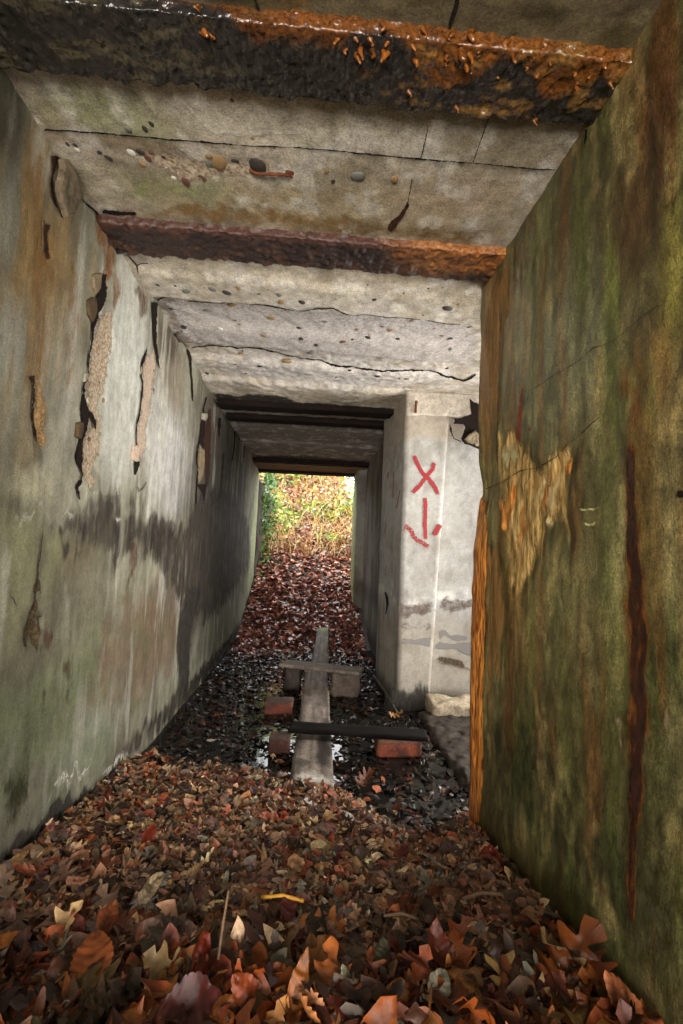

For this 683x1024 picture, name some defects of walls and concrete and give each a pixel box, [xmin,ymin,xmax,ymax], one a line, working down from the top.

rust [193,4,216,40]
rust [333,21,391,65]
rust [444,28,481,74]
peeling [50,142,136,218]
spalling [127,149,294,187]
crack [44,118,555,204]
crack [130,297,476,504]
peeling [486,417,600,598]
damp [60,486,250,775]
rust [469,497,505,825]
rust [623,446,649,924]
damp [0,769,91,863]